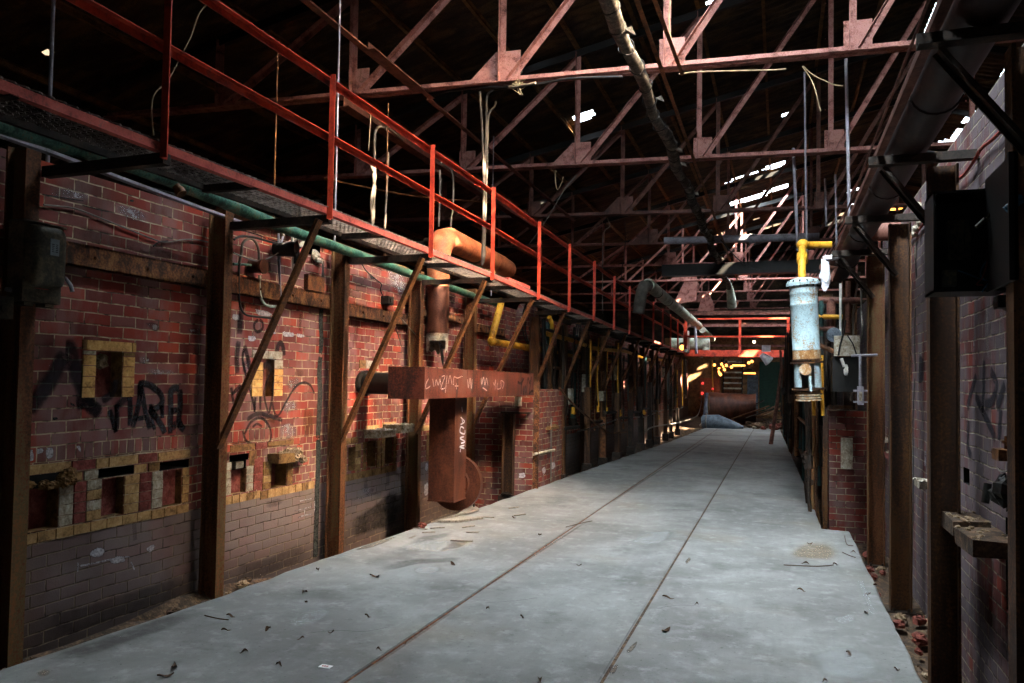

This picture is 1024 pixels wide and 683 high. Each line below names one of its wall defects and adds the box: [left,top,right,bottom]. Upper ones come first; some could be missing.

rust [792,349,821,359]